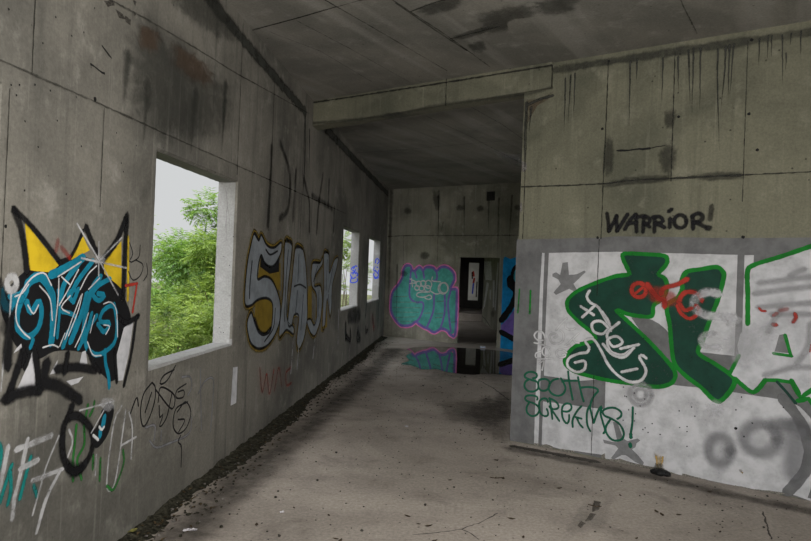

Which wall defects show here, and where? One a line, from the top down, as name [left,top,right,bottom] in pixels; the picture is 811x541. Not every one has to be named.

leakage [556,30,810,126]
leakage [619,147,674,184]
leakage [703,172,734,180]
crack [414,513,498,539]